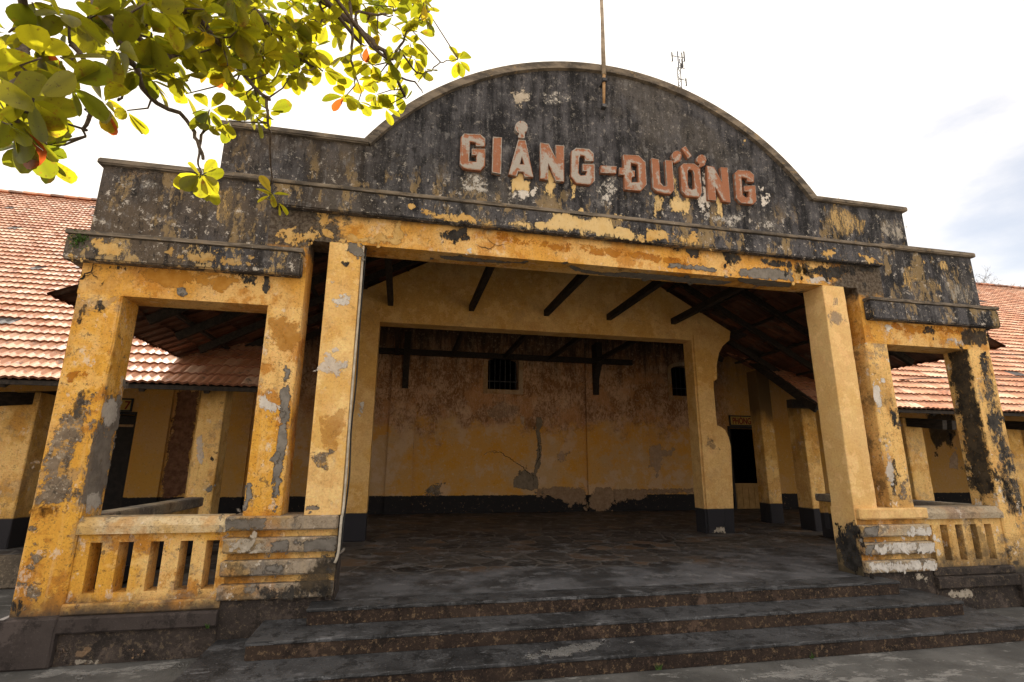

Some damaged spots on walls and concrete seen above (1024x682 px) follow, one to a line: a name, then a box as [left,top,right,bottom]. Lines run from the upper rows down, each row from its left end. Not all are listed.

damp [440,227,471,244]
damp [512,187,538,200]
peeling [508,179,713,252]
damp [649,172,740,227]
damp [761,258,874,289]
flaking render [78,379,129,510]
flaking render [217,365,291,538]
spalling [312,449,335,471]
crack [485,417,543,494]
damp [926,328,1022,516]
peeling [513,470,694,511]
flaking render [262,537,345,578]